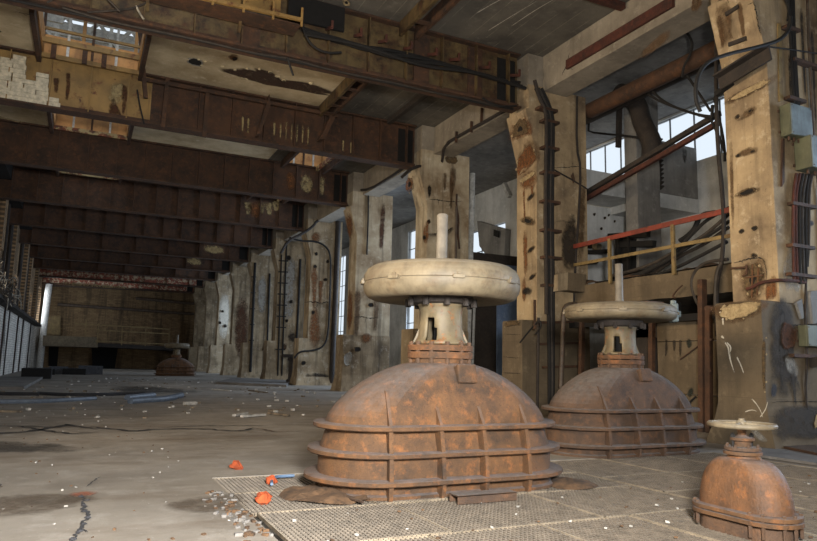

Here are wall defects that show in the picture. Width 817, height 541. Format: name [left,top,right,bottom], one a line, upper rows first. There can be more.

spalling [510,117,540,183]
corrosion [521,173,535,217]
crack [1,424,284,434]
crack [69,477,99,541]